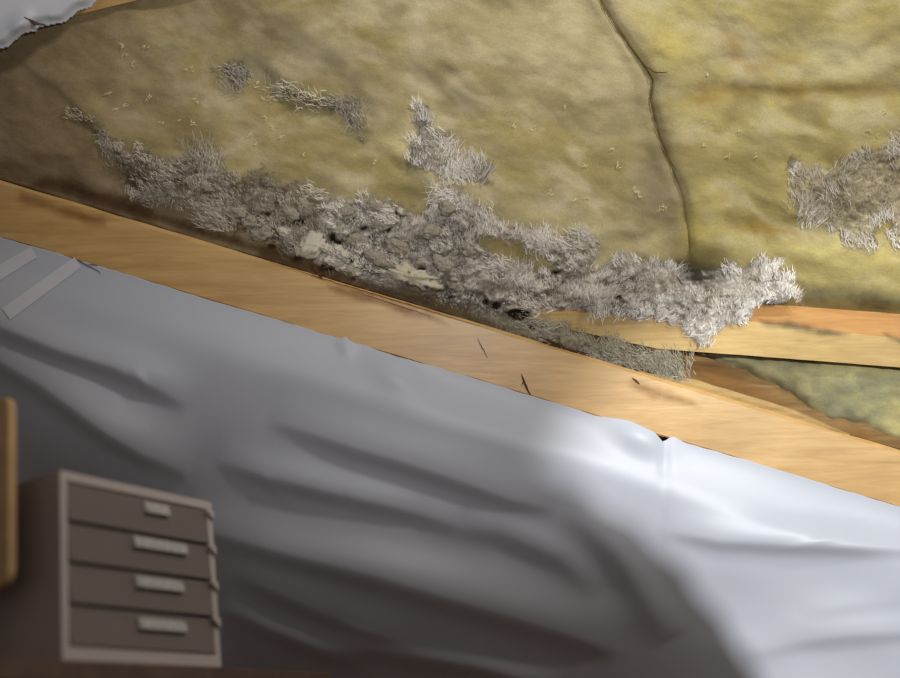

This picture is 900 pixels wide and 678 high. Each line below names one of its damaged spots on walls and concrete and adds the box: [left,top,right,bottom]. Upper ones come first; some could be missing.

crack [600,0,676,177]